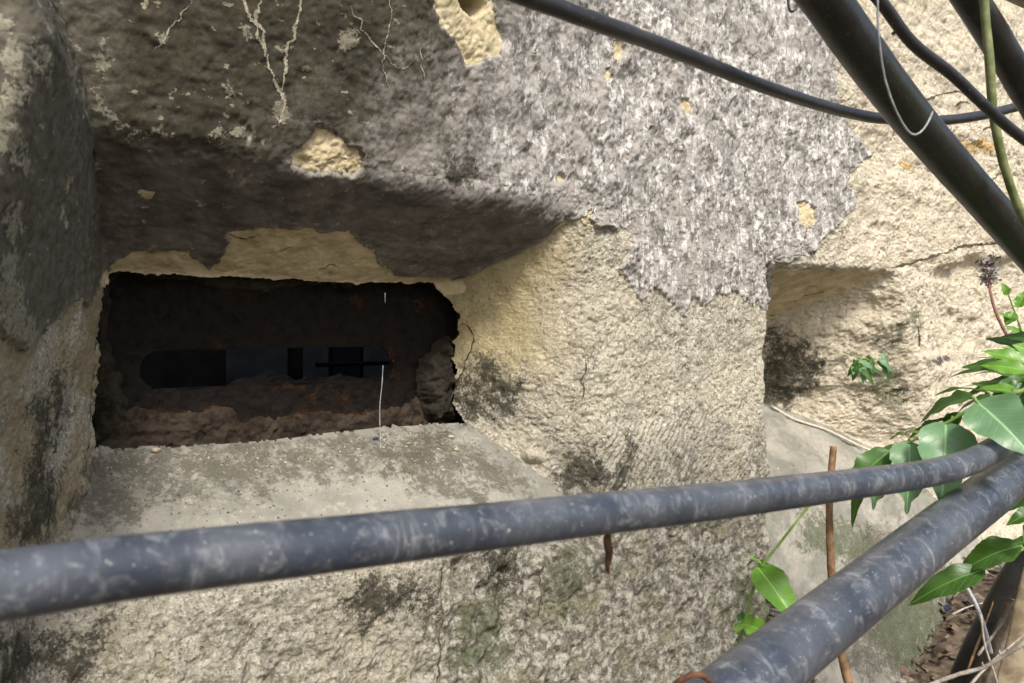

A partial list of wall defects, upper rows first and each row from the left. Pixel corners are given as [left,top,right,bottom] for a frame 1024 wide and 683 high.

spalling [433,0,502,65]
spalling [289,128,365,174]
peeling [957,137,994,154]
spalling [795,201,815,234]
spalling [99,227,466,295]
rust [92,271,458,450]
leakage [762,318,834,412]
leakage [3,348,532,549]
leakage [550,428,642,494]